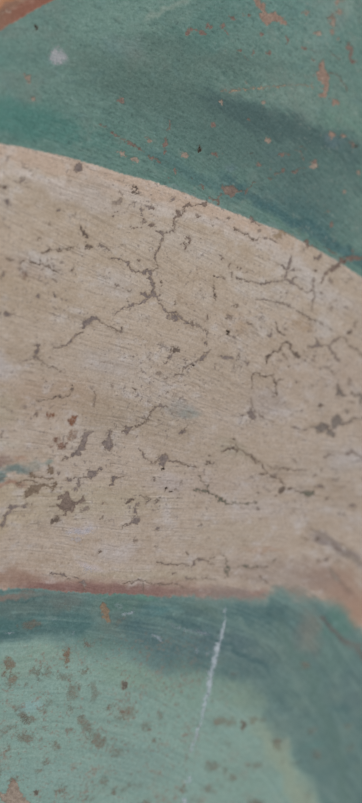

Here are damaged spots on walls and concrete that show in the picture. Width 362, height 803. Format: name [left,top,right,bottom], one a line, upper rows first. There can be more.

peeling [248,0,287,36]
peeling [312,59,339,106]
crack [25,194,222,399]
crack [213,249,362,420]
spalling [309,380,362,437]
crack [0,503,32,527]
spalling [16,465,89,524]
crack [67,467,103,488]
crack [122,497,159,528]
crack [139,450,257,507]
crack [223,438,300,494]
peeling [0,779,39,803]